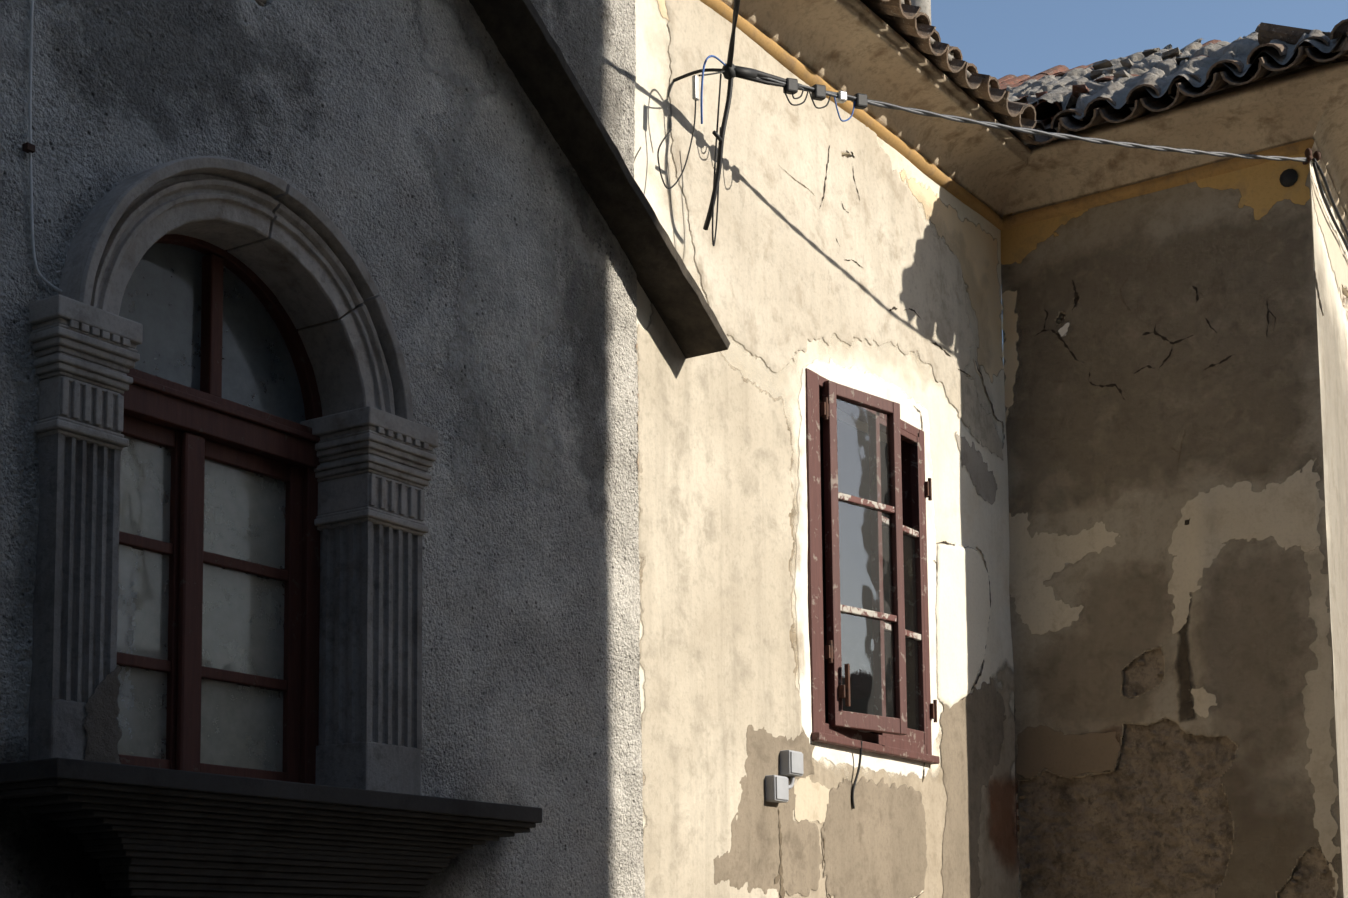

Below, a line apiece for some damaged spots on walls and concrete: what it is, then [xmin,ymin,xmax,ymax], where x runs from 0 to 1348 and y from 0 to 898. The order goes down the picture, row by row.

peeling [1196,153,1348,317]
peeling [636,0,1237,898]
crack [889,306,1005,449]
crack [1034,280,1234,400]
crack [1266,302,1276,336]
peeling [1168,458,1341,898]